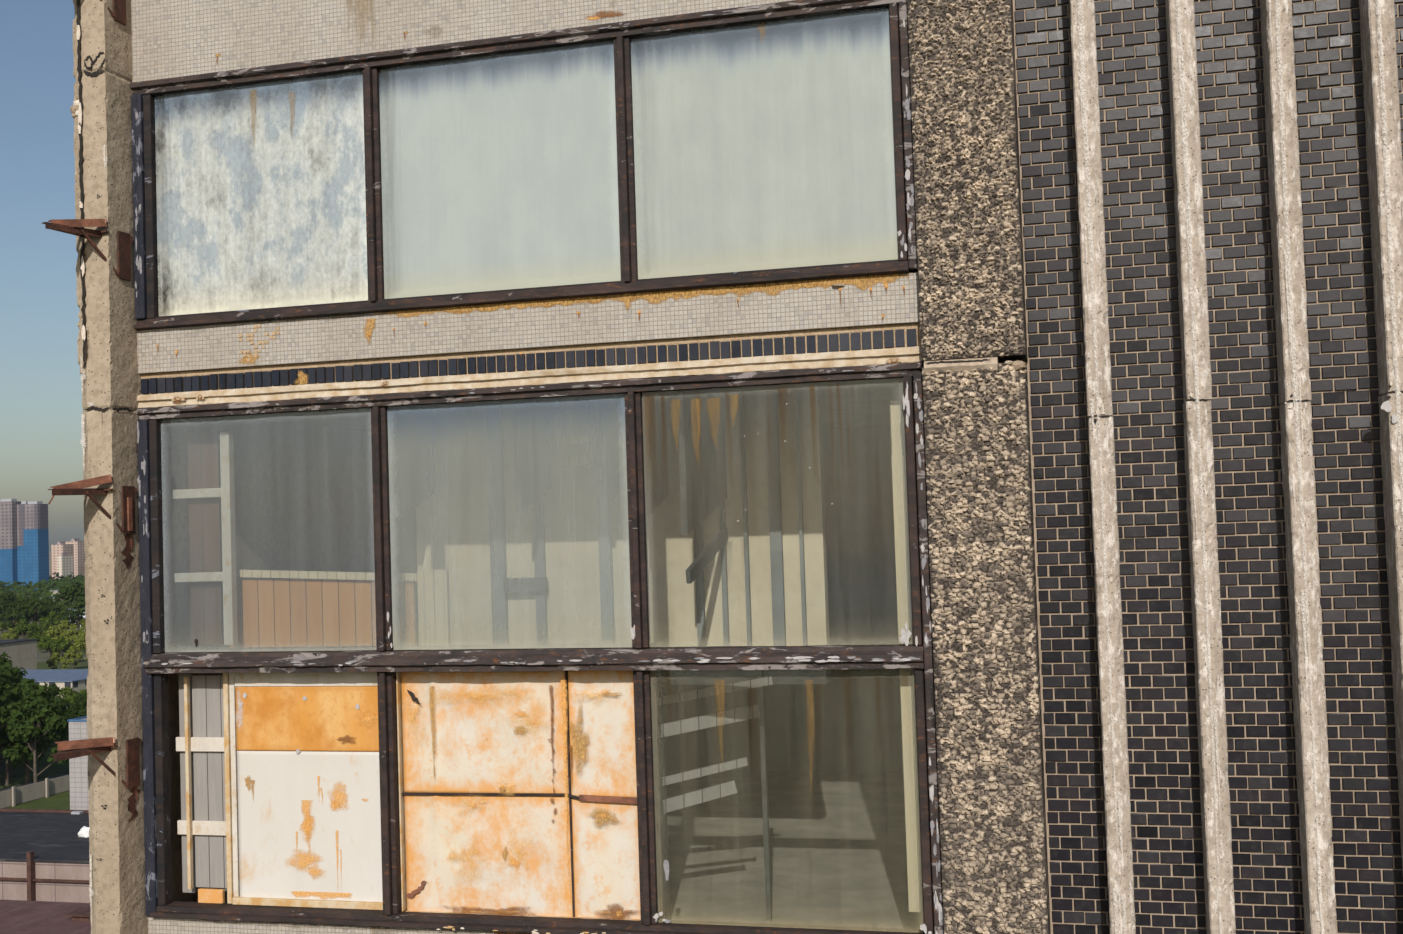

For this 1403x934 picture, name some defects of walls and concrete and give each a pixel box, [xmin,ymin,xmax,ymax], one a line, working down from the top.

peeling [785,519,932,663]
rust [127,787,140,822]
rust [401,670,641,920]